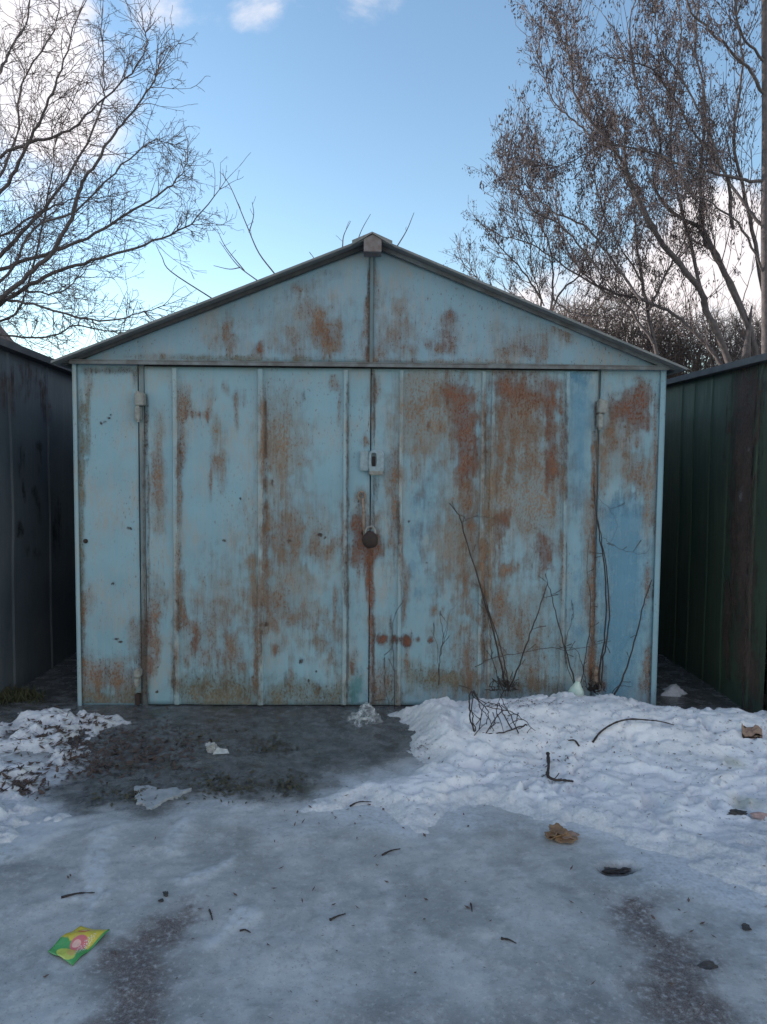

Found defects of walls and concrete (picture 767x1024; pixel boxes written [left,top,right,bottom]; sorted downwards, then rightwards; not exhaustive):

rust [81,391,340,697]
rust [351,335,568,702]
rust [583,383,658,682]